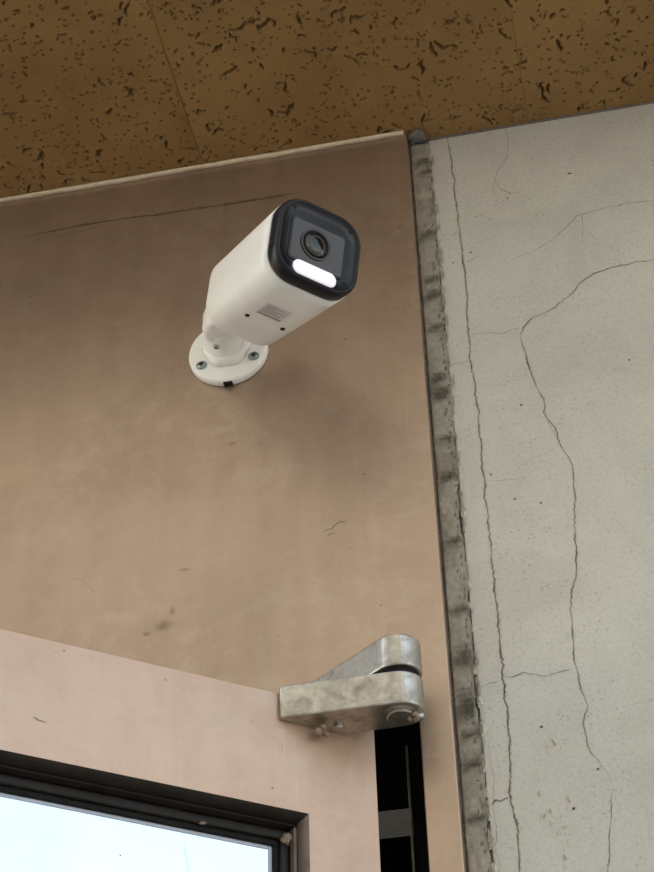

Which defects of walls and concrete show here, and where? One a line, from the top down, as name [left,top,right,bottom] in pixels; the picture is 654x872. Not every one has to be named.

crack [447,140,653,872]